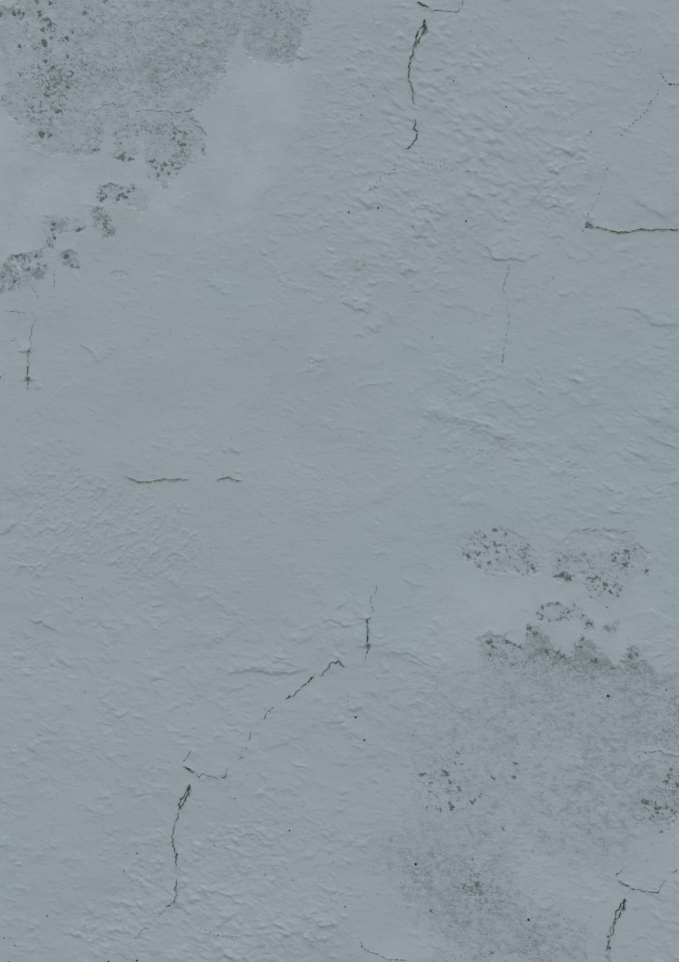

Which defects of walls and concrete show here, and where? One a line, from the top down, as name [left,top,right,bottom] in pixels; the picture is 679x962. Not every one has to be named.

peeling [0,0,332,296]
crack [369,0,489,190]
crack [579,168,679,237]
crack [0,270,55,391]
crack [120,467,244,486]
crack [129,586,377,944]
crack [358,937,408,962]
damp [328,708,679,962]
peeling [390,523,679,841]
crack [605,866,677,962]